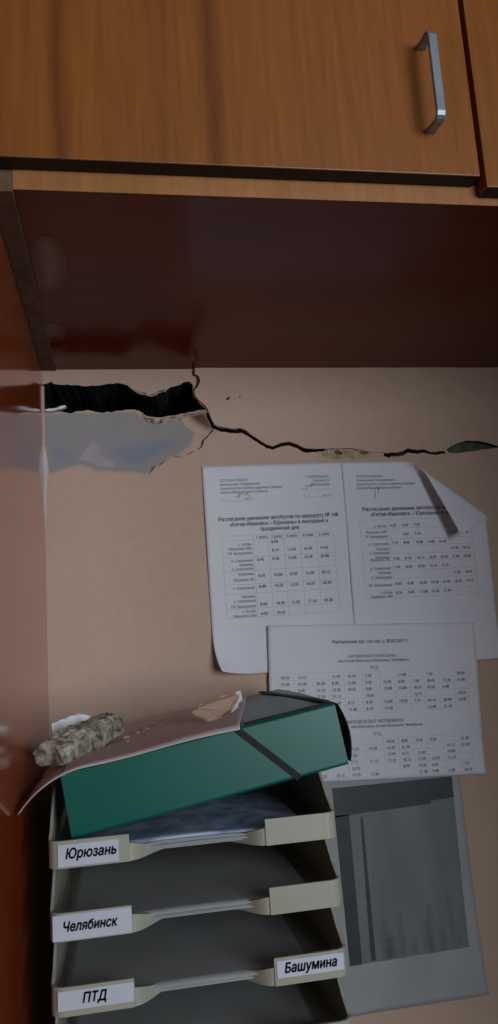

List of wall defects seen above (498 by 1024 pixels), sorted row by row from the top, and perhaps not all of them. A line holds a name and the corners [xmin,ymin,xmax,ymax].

peeling [42,382,220,480]
crack [149,369,445,474]